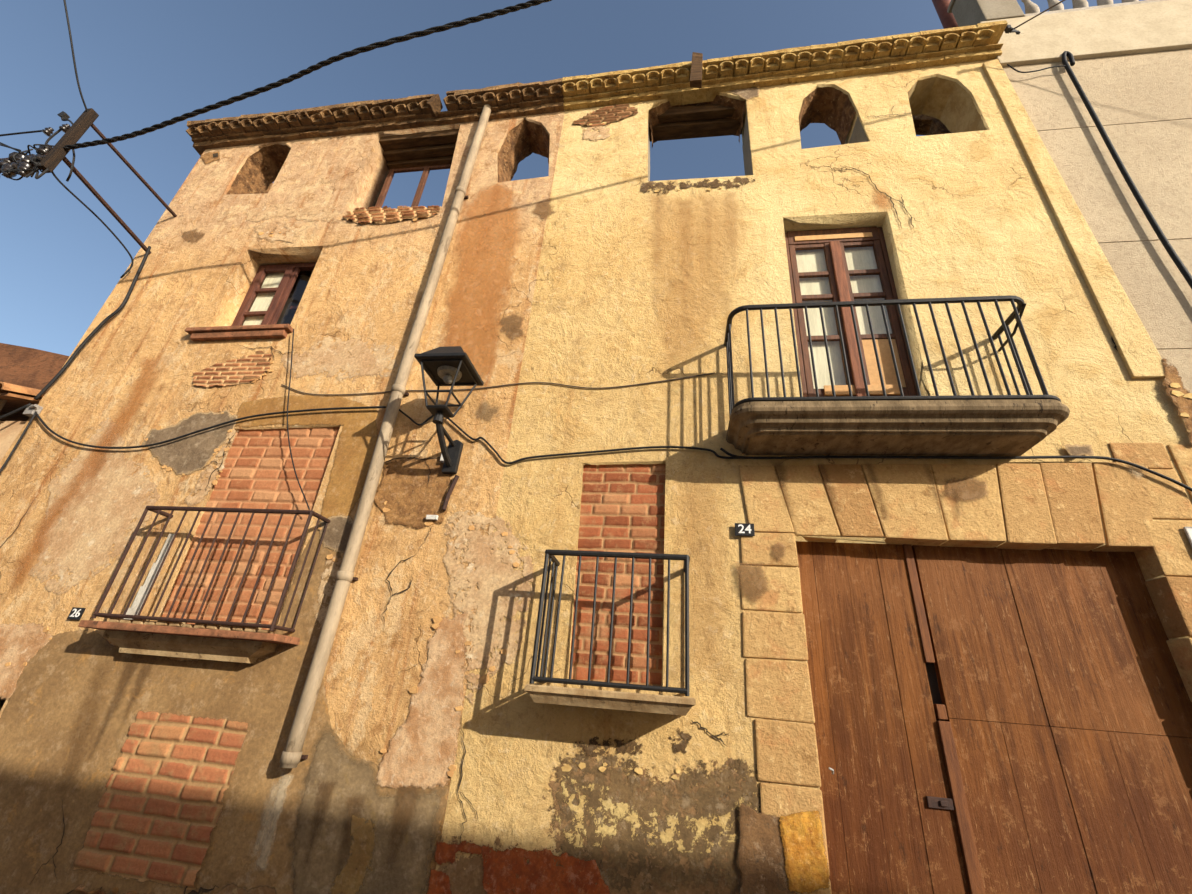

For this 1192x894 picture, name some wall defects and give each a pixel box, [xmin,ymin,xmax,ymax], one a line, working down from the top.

flaking render [572,104,638,141]
crack [823,165,916,228]
flaking render [1162,358,1192,444]
flaking render [28,410,238,595]
water stain [945,477,988,501]
crack [383,527,432,626]
peeling [374,456,536,790]
water stain [255,776,291,868]
water stain [290,731,441,894]
crack [457,713,479,842]
peeling [427,751,772,894]
crack [184,885,219,894]